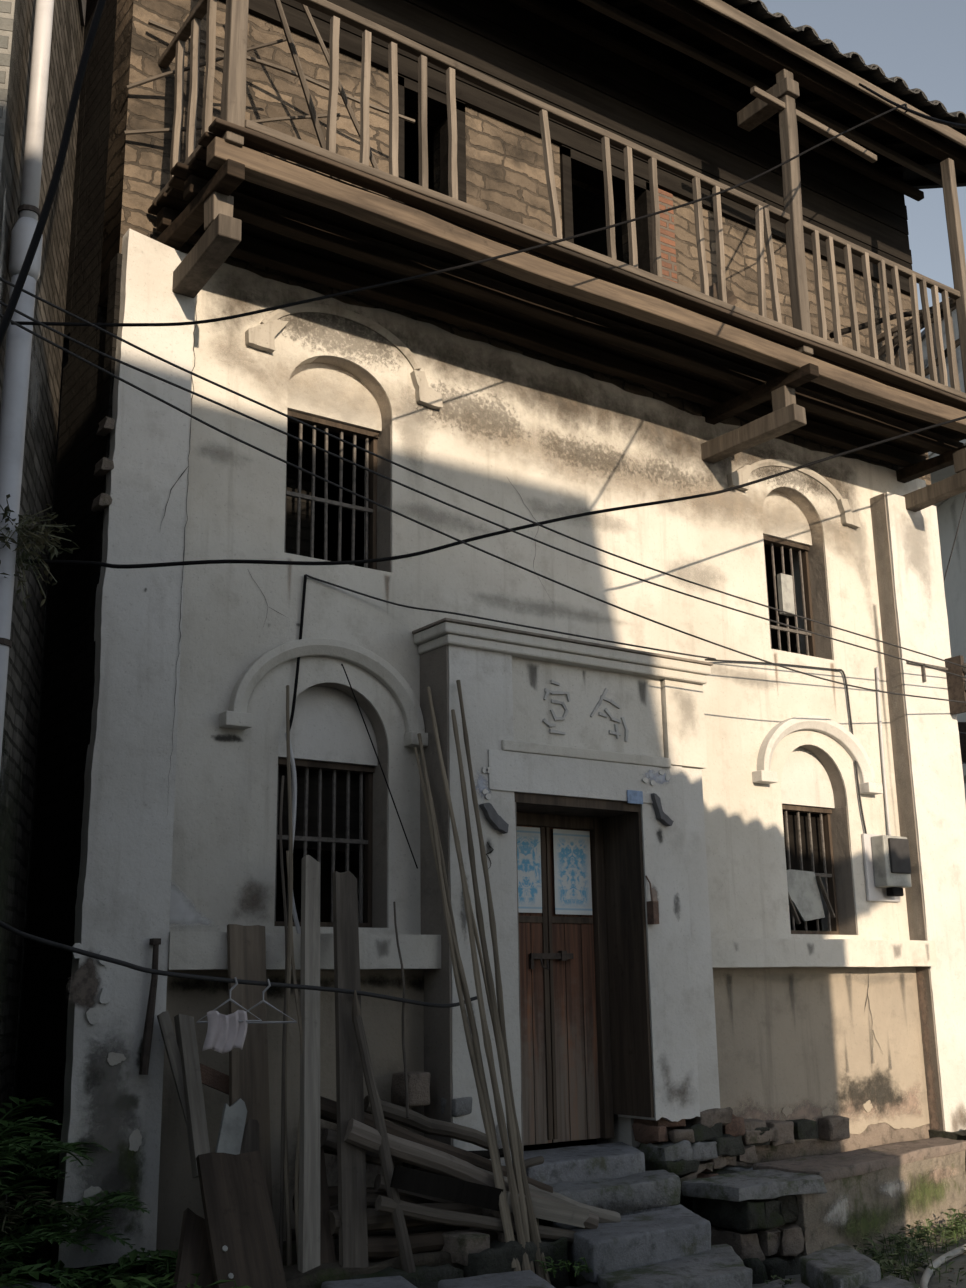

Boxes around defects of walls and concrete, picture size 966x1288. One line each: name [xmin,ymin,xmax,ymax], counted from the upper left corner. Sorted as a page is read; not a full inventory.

spalling [68,943,112,1025]
damp [839,1057,902,1113]
peeling [77,1041,143,1233]